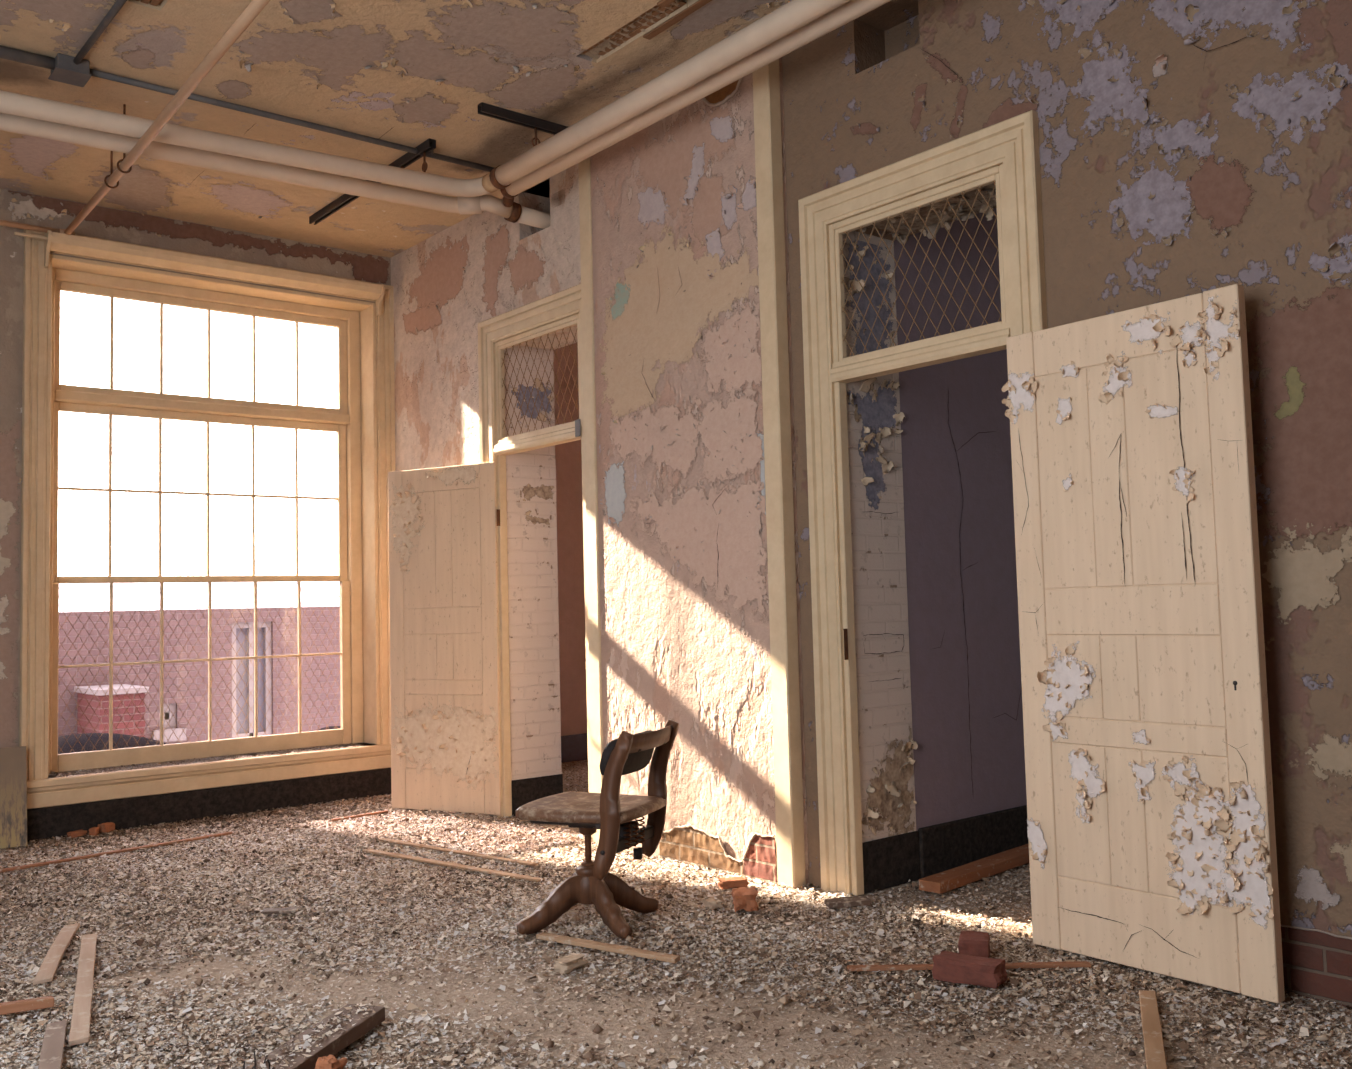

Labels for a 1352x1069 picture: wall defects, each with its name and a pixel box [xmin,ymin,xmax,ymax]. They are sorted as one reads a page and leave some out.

peeling [215,0,586,125]
peeling [1018,0,1219,246]
peeling [1141,0,1329,55]
peeling [1229,61,1352,145]
peeling [0,135,390,284]
peeling [595,78,759,424]
peeling [847,377,905,510]
flaking render [659,824,776,885]
peeling [862,718,918,837]
peeling [1027,818,1047,869]
peeling [1036,641,1105,824]
peeling [1129,730,1352,1008]